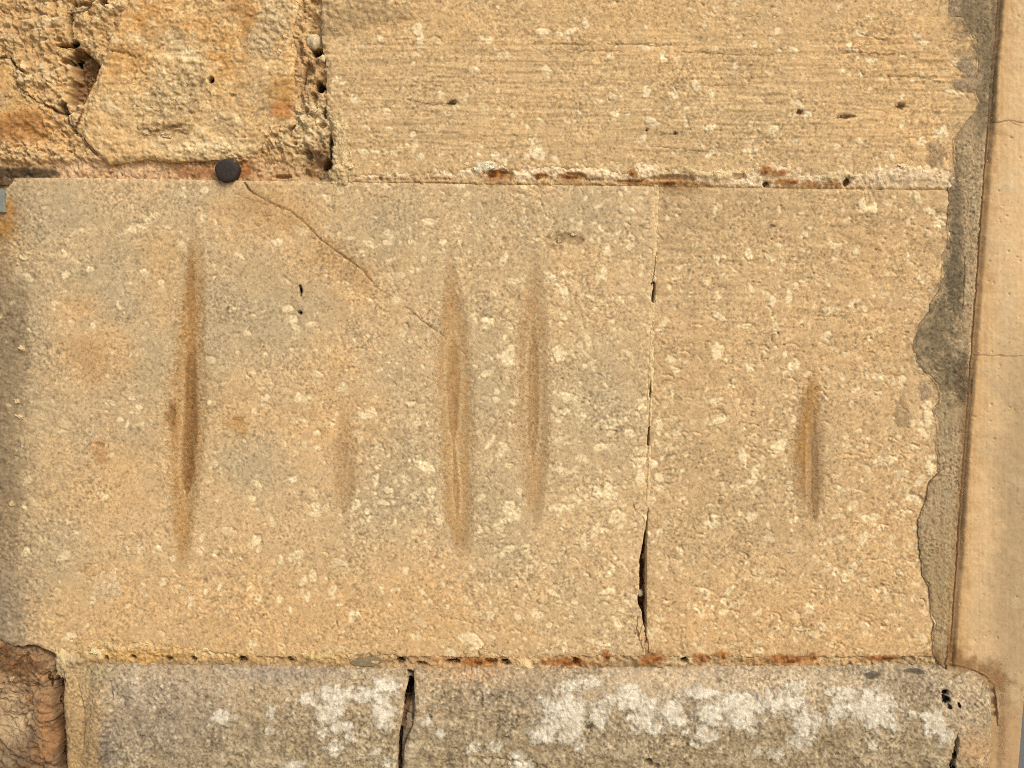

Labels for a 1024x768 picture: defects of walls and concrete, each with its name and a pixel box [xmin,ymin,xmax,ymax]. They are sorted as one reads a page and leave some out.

rust [483,170,513,180]
rust [562,172,583,181]
rust [627,168,703,185]
rust [759,166,841,186]
crack [244,182,372,281]
crack [649,254,657,302]
damp [918,173,972,400]
crack [634,484,650,653]
rust [540,658,583,666]
rust [694,651,728,663]
rust [767,652,817,664]
crack [399,676,414,764]